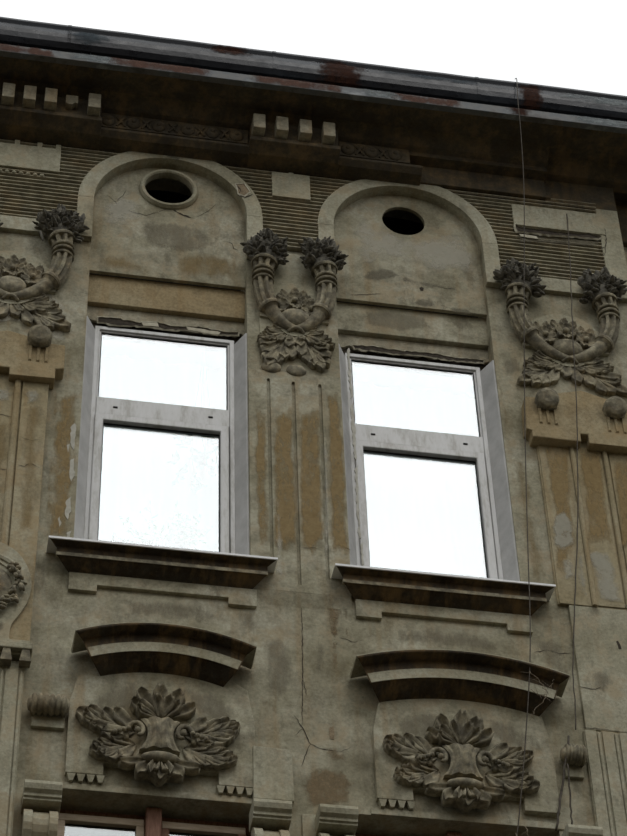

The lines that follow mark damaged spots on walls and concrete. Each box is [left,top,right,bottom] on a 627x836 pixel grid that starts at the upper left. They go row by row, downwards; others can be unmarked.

rust [213,45,245,55]
rust [257,61,361,92]
rust [521,85,543,110]
peeling [67,423,76,481]
peeling [58,497,72,537]
crack [296,605,351,765]